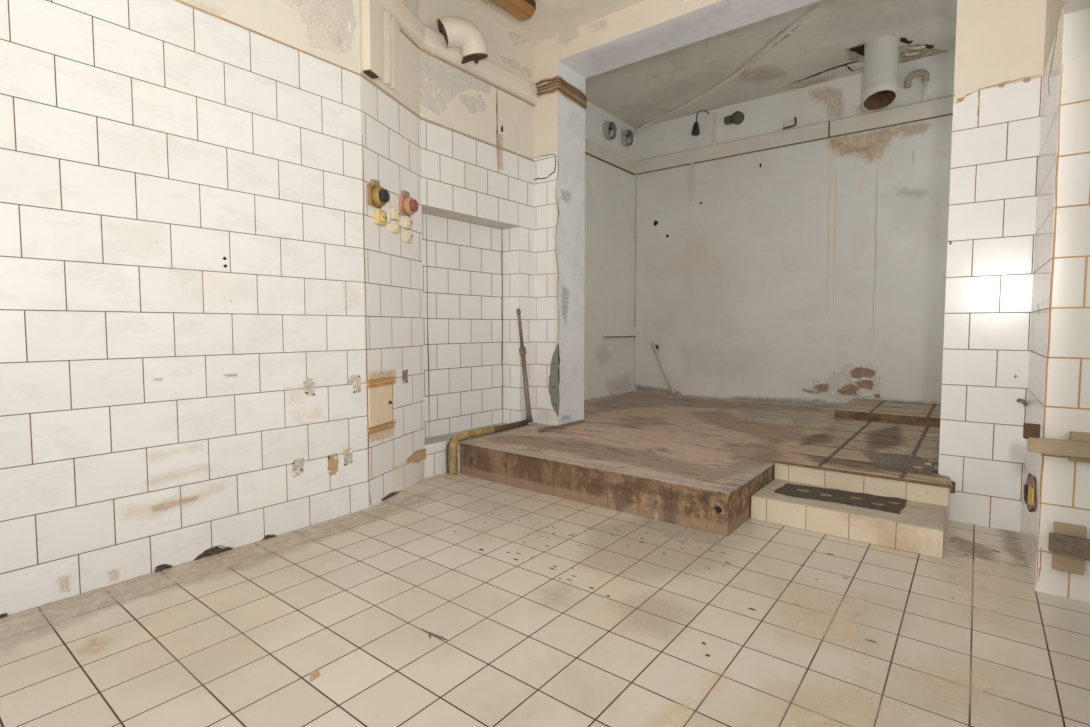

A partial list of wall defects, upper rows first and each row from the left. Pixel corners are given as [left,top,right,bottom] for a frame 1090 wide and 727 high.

spalling [303,378,315,397]
spalling [347,375,361,393]
peeling [800,365,880,401]
spalling [291,458,305,478]
spalling [327,448,352,476]
spalling [407,448,427,463]